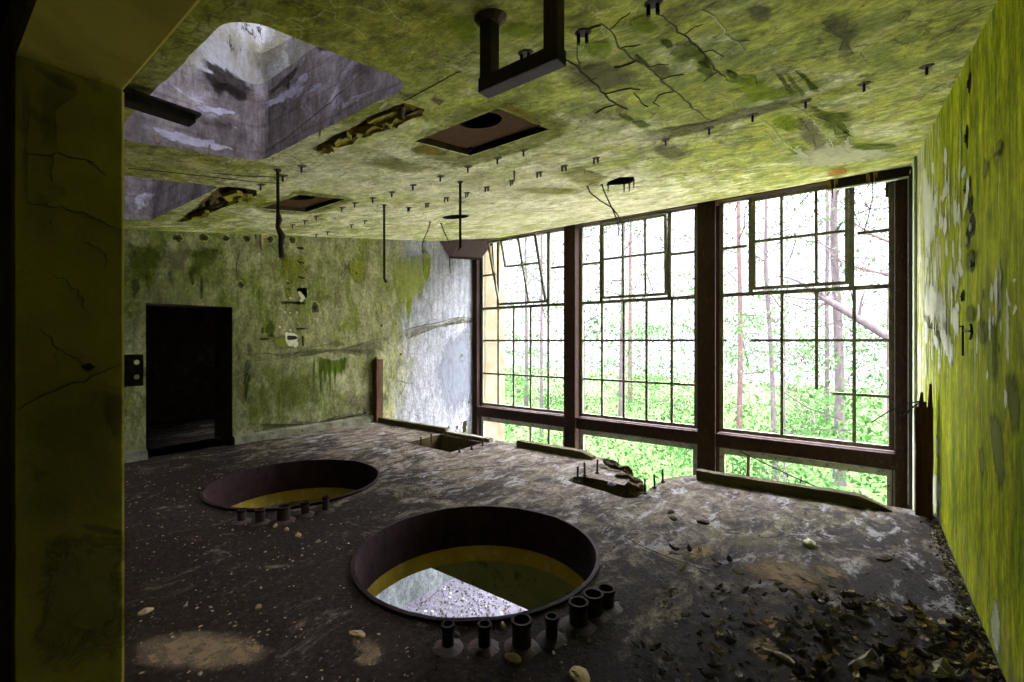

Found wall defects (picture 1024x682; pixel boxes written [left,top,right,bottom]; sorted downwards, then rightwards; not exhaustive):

crack [566,10,750,121]
spalling [306,102,425,155]
crack [760,104,851,155]
crack [25,152,121,265]
spalling [178,186,257,222]
peeling [922,125,976,369]
leakage [247,328,382,392]
leakage [257,394,386,432]